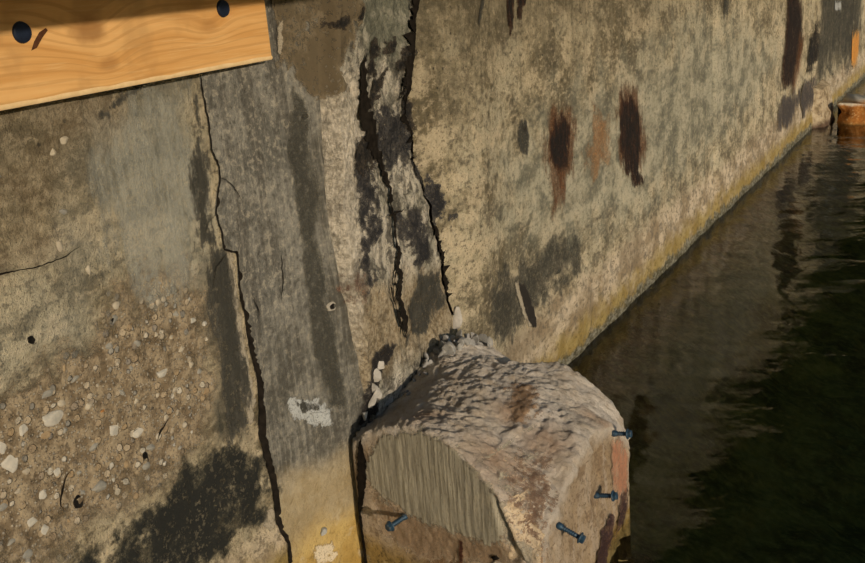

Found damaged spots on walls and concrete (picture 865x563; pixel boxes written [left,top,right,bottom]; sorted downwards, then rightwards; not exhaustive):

crack [0,247,79,275]
crack [200,73,293,563]
crack [356,53,408,563]
crack [398,0,454,315]
corrosion [542,105,577,221]
corrosion [616,81,648,188]